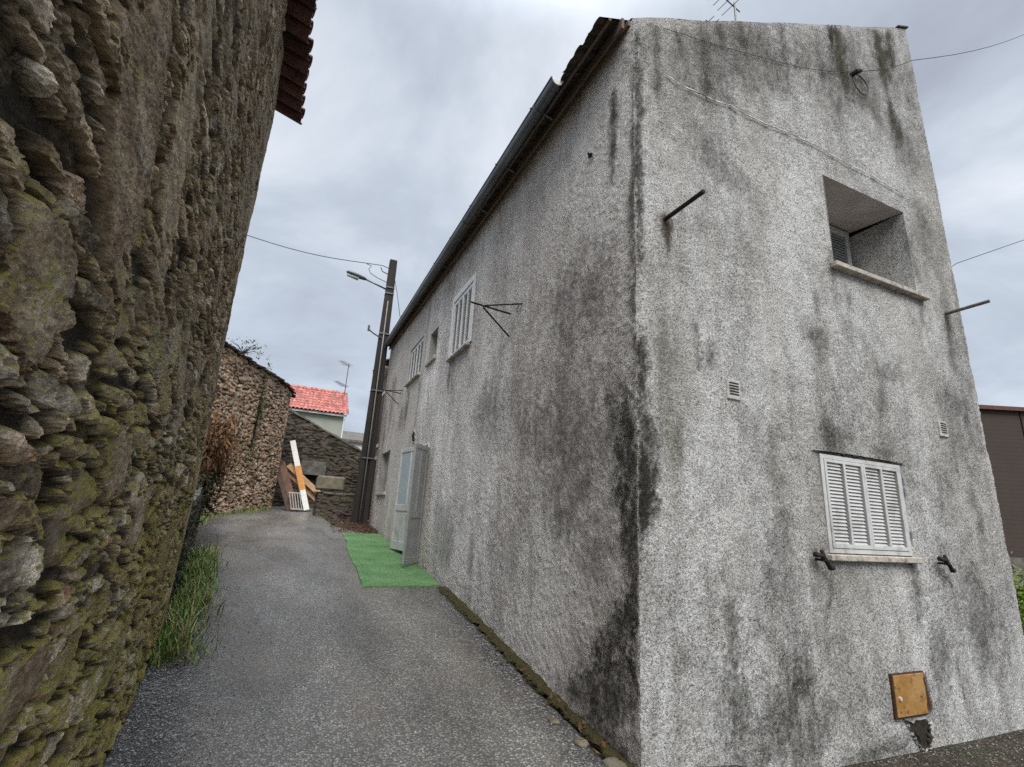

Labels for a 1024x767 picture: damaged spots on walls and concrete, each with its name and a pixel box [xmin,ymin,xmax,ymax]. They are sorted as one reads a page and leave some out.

damp [819,25,856,88]
damp [873,29,903,143]
rust [662,212,674,251]
damp [606,26,662,715]
spalling [904,716,935,752]